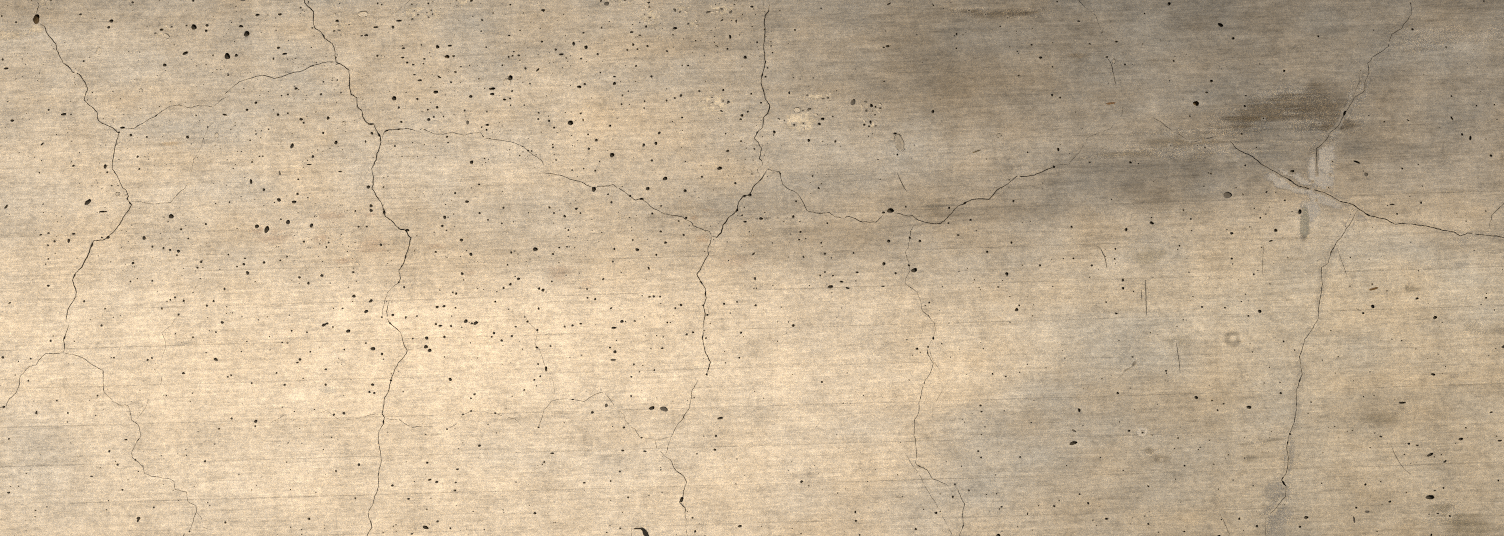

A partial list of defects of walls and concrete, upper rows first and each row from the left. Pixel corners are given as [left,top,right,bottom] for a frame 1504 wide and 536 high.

crack [0,0,1123,536]
crack [1154,3,1504,535]